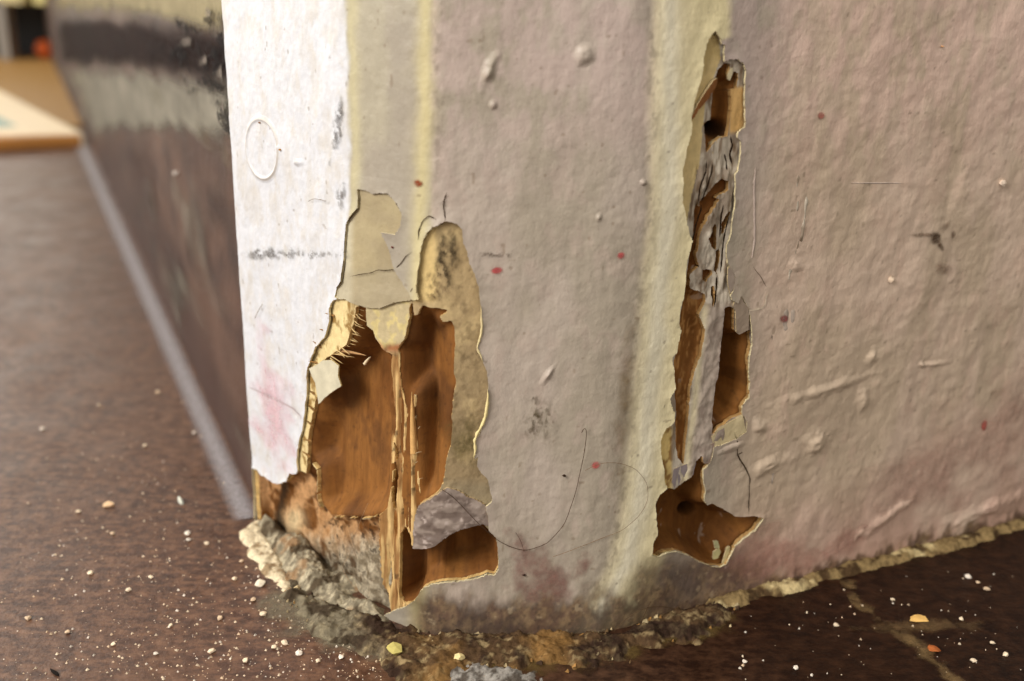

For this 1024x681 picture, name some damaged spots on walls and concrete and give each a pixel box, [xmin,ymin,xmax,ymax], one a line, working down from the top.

spalling [288,190,498,602]
peeling [652,31,762,568]